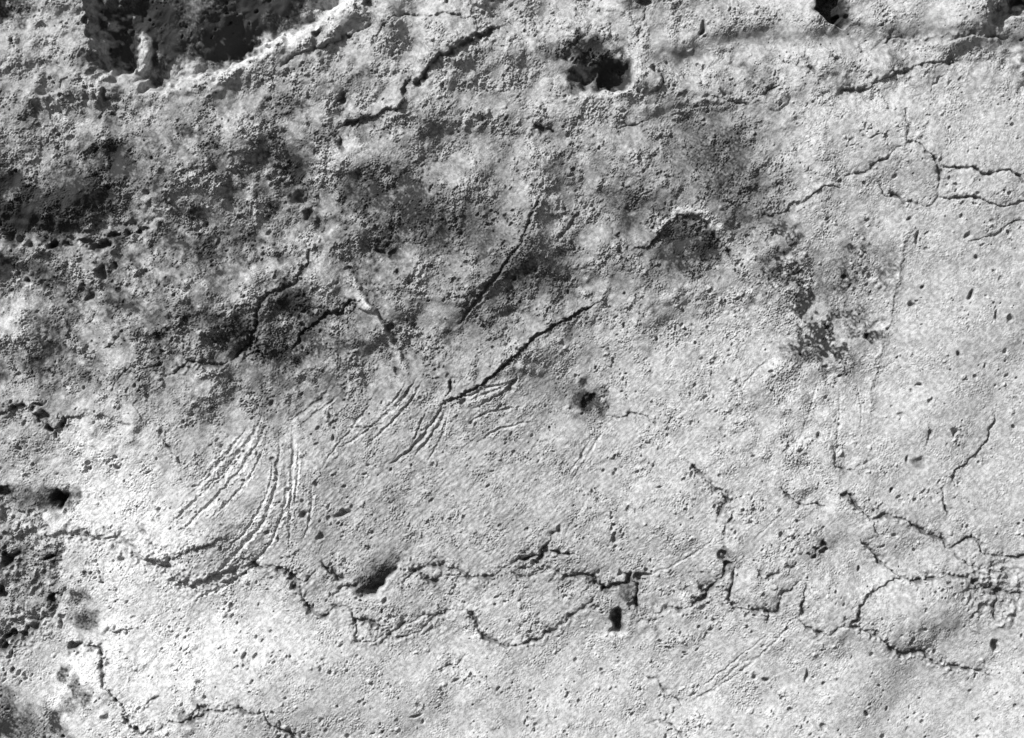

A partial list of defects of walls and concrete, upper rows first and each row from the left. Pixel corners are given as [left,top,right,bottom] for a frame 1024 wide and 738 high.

hole [310,29,322,41]
crack [280,8,508,156]
crack [763,107,1024,244]
crack [169,249,363,378]
crack [32,521,599,673]
crack [637,409,1024,678]